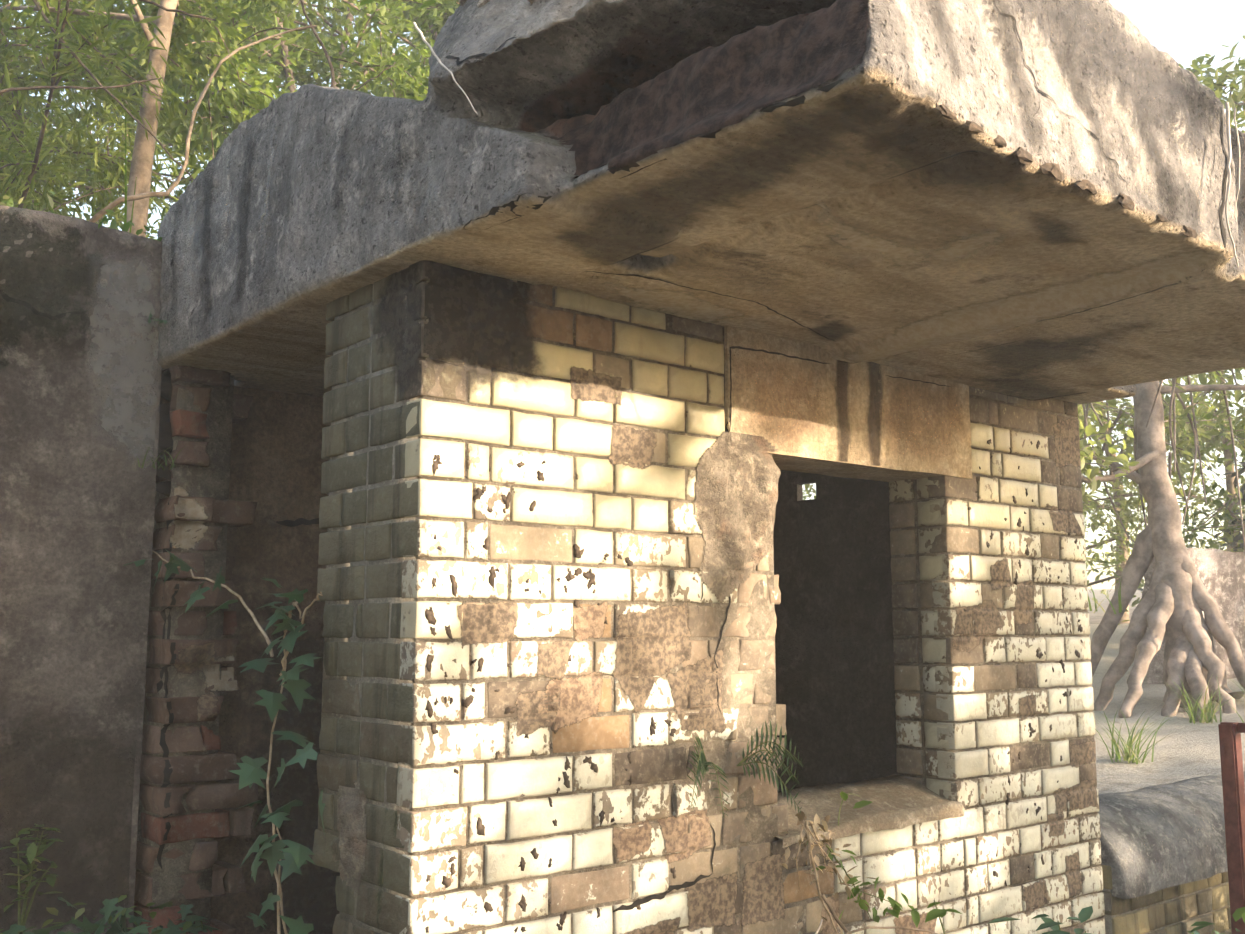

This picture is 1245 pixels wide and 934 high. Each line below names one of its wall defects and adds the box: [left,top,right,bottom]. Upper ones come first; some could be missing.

spalling [544,0,870,180]
damp [374,260,541,393]
crack [276,518,319,527]
peeling [425,574,541,672]
peeling [504,544,726,749]
crack [697,582,731,714]
peeling [952,488,1083,653]
peeling [548,756,598,826]
peeling [1034,741,1098,837]
crack [613,823,716,912]
peeling [611,809,785,934]
peeling [1022,851,1082,916]